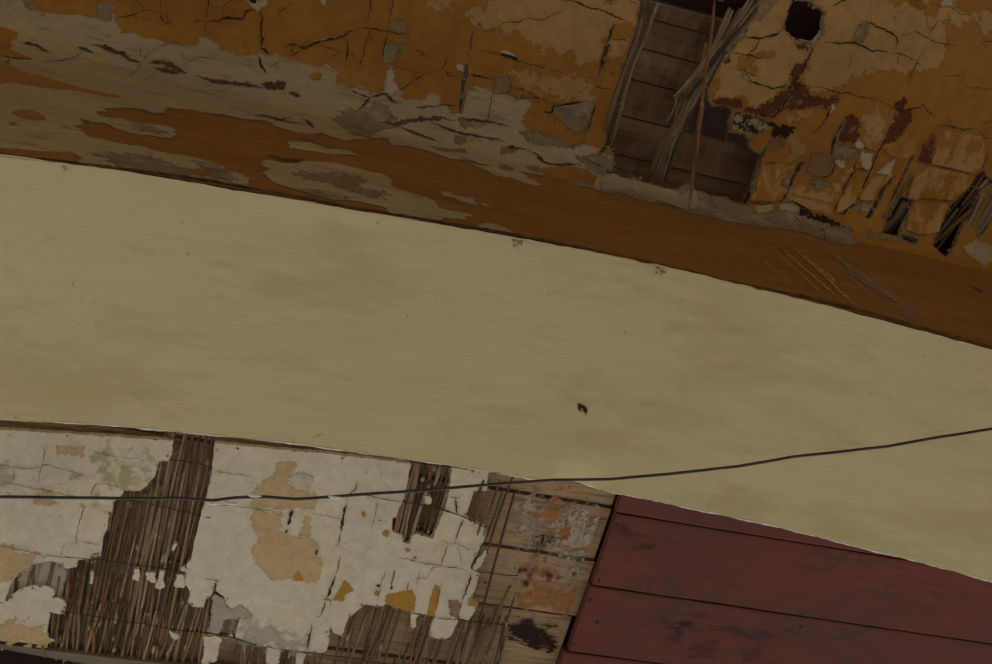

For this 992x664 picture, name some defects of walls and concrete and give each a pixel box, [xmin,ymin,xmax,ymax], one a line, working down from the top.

crack [96,0,627,130]
peeling [0,0,992,247]
crack [731,0,992,241]
peeling [6,562,68,599]
crack [3,450,125,560]
peeling [207,595,254,636]
crack [213,480,403,650]
crack [377,496,485,620]
peeling [448,600,461,619]
water stain [498,486,600,653]